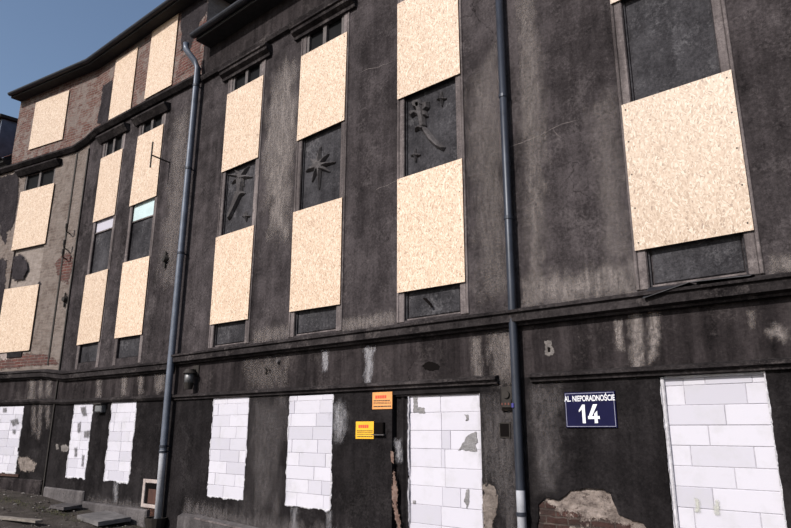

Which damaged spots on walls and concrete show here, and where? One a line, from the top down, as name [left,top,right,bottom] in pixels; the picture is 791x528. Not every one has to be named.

flaking render [0,254,28,314]
flaking render [55,253,73,284]
water stain [615,312,659,367]
flaking render [17,456,37,473]
flaking render [390,451,401,528]
flaking render [481,484,498,528]
flaking render [538,488,646,528]